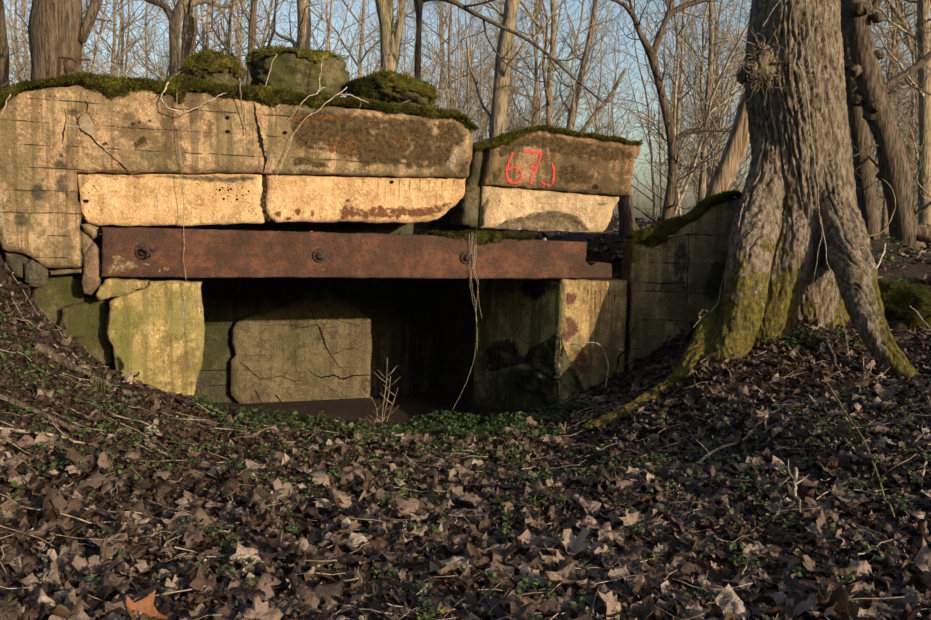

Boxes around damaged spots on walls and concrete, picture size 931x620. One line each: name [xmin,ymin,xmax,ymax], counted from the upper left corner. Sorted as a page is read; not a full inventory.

crack [62,99,128,171]
crack [253,104,270,221]
corrosion [340,199,451,219]
crack [239,307,369,402]